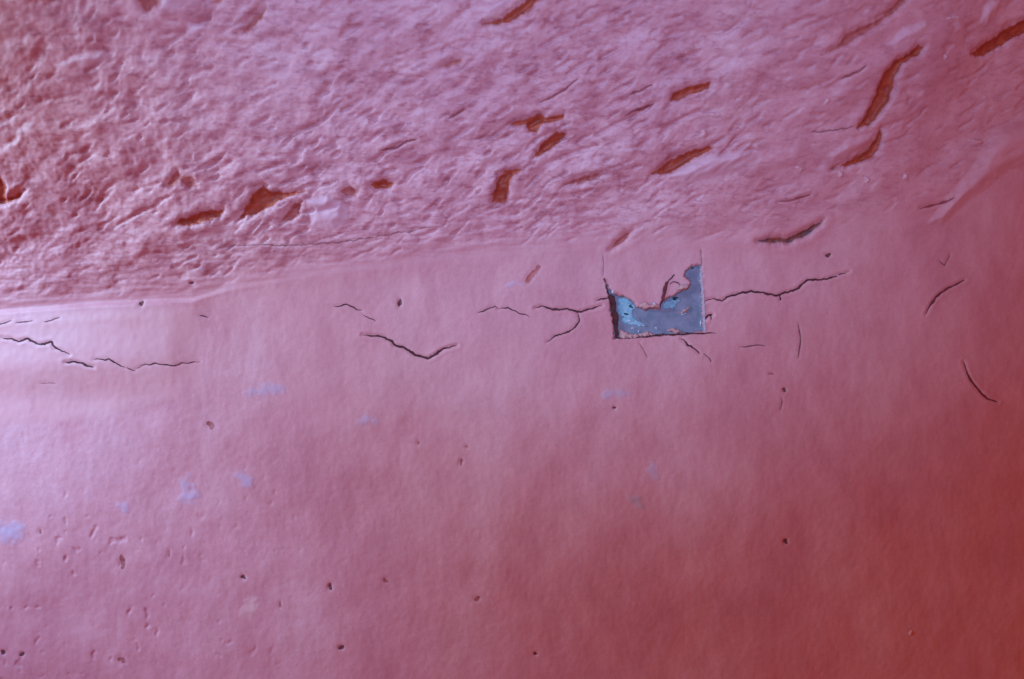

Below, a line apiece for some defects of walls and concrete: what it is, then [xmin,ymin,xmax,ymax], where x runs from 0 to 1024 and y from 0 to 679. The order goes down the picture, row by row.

spalling [831,43,924,169]
spalling [510,113,566,158]
spalling [651,146,713,175]
spalling [237,185,305,222]
spalling [491,168,524,204]
crack [0,317,200,383]
crack [335,304,456,360]
crack [478,298,607,342]
spalling [603,264,713,339]
crack [705,271,848,320]
crack [926,259,964,313]
crack [964,363,997,402]